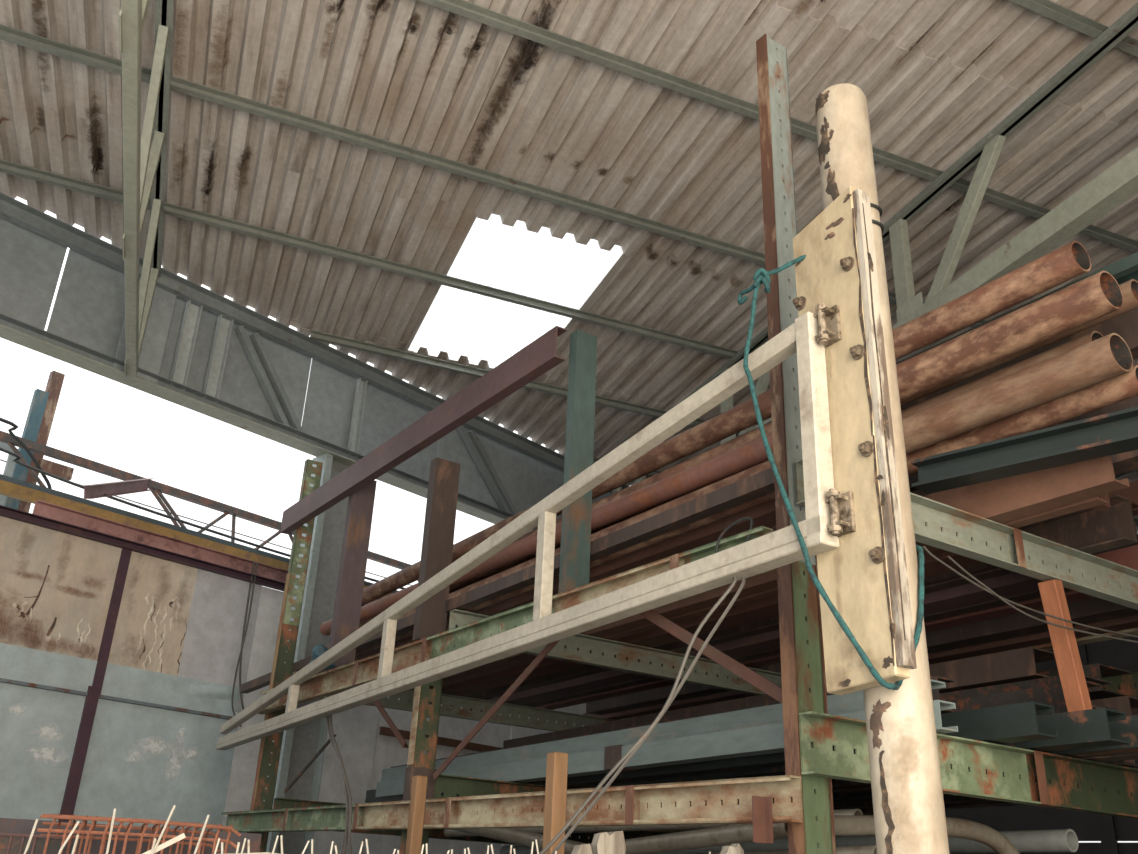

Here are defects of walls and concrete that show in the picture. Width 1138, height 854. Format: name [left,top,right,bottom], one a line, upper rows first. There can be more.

leakage [532,0,559,30]
leakage [464,27,485,58]
leakage [471,39,544,166]
leakage [87,105,103,174]
peeling [815,90,852,203]
peeling [824,217,845,240]
peeling [870,699,891,749]